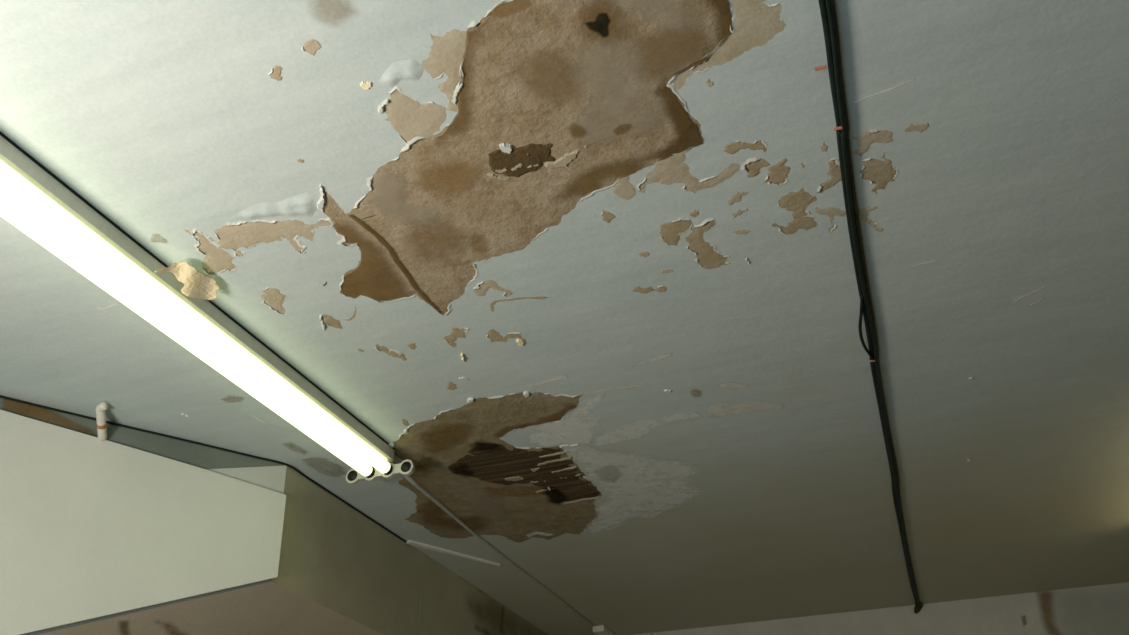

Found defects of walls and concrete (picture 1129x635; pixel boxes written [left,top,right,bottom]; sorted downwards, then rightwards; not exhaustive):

flaking render [154,0,931,362]
peeling [289,444,345,476]
flaking render [389,391,606,543]
leakage [529,384,781,533]